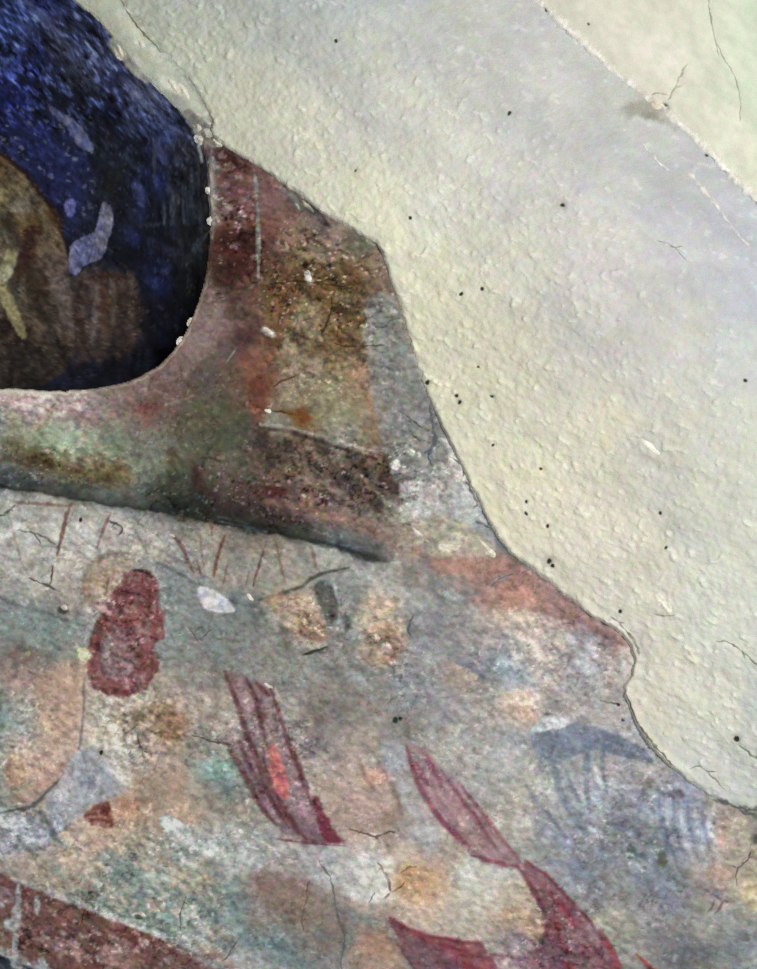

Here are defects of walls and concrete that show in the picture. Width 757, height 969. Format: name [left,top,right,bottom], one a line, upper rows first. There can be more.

crack [612,697,672,765]
crack [695,766,757,815]